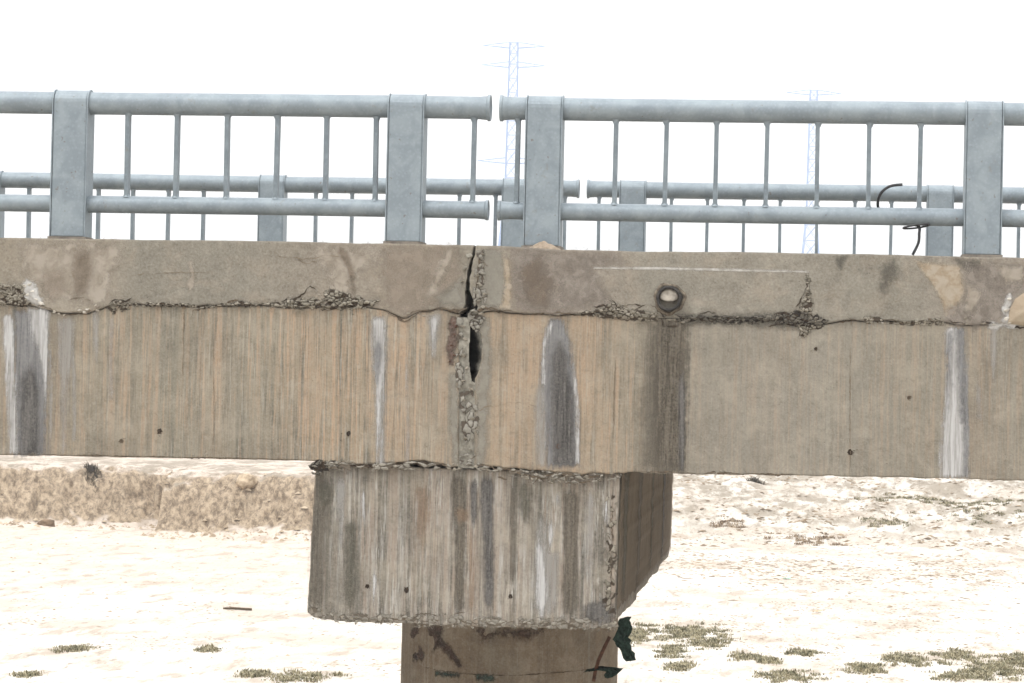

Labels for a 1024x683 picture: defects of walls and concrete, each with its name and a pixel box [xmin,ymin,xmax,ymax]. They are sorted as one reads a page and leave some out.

damp [3,279,75,456]
peeling [0,241,381,314]
spalling [19,250,622,485]
crack [0,255,646,373]
efflorescence [371,318,387,463]
crack [458,402,533,466]
damp [510,319,688,623]
spalling [575,275,828,338]
peeling [863,262,1024,328]
efflorescence [939,328,968,478]
damp [312,479,365,607]
damp [451,476,494,612]